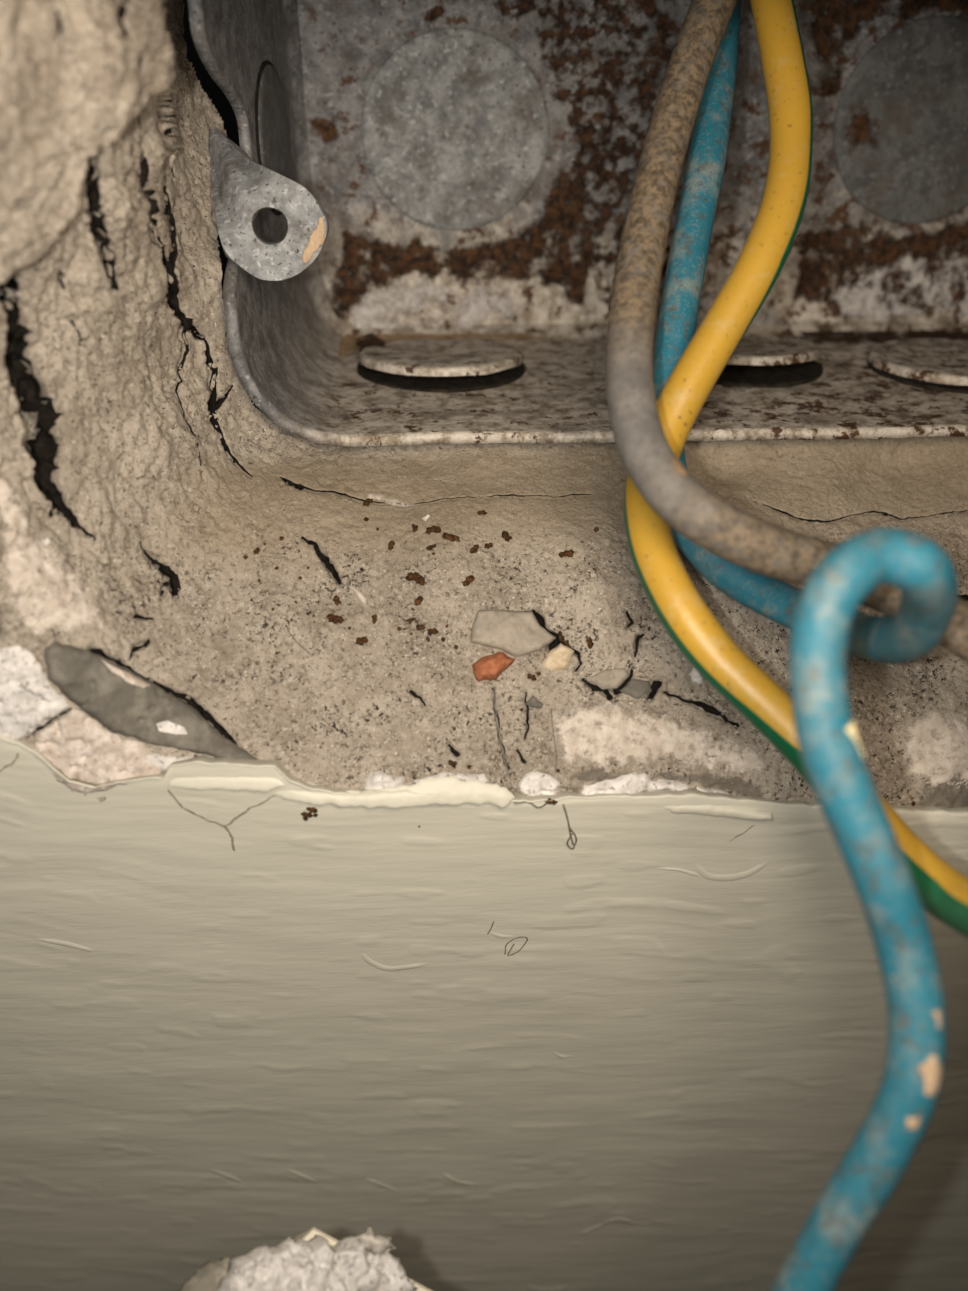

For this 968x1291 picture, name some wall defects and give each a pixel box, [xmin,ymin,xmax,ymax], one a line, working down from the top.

crack [115,0,143,70]
rust [811,0,968,98]
crack [0,267,96,541]
crack [85,153,119,290]
crack [138,116,591,505]
rust [355,332,385,352]
rust [331,0,676,320]
rust [794,220,968,344]
spalling [0,645,561,809]
peeling [542,643,574,671]
peeling [588,668,652,699]
spalling [581,772,773,821]